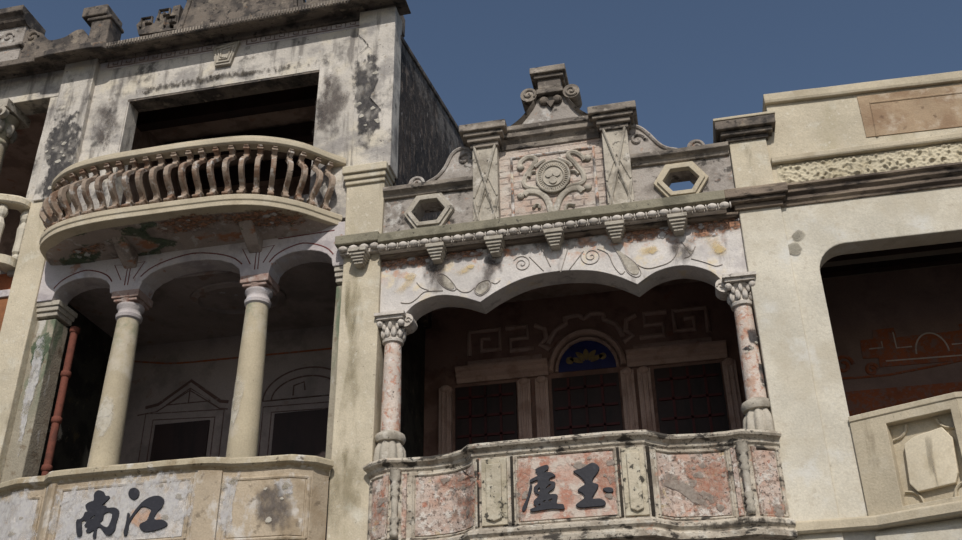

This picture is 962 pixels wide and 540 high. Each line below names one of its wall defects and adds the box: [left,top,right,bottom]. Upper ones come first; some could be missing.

leakage [318,53,381,141]
leakage [42,111,82,200]
peeling [60,244,106,266]
peeling [115,210,306,256]
peeling [0,489,37,540]
peeling [49,472,195,540]
peeling [662,456,728,511]